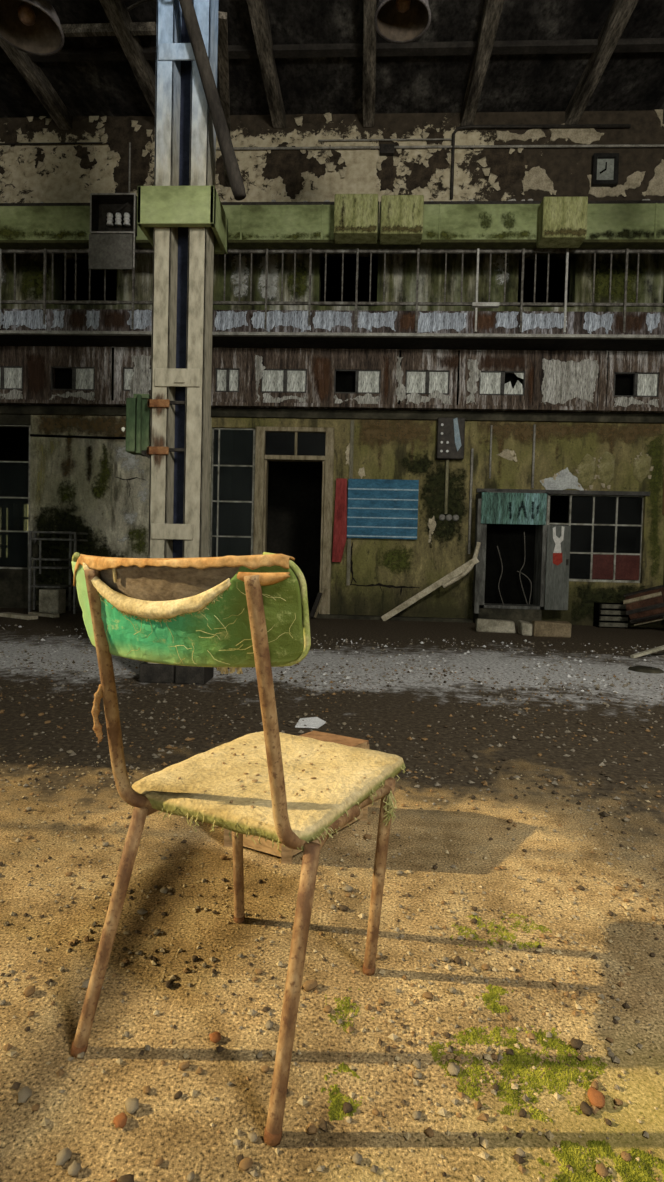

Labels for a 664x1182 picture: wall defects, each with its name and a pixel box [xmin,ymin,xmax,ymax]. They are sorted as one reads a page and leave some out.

flaking render [0,116,51,169]
flaking render [72,116,152,194]
flaking render [376,127,455,201]
flaking render [477,123,604,201]
flaking render [587,159,664,200]
damp [32,415,147,603]
damp [359,419,467,548]